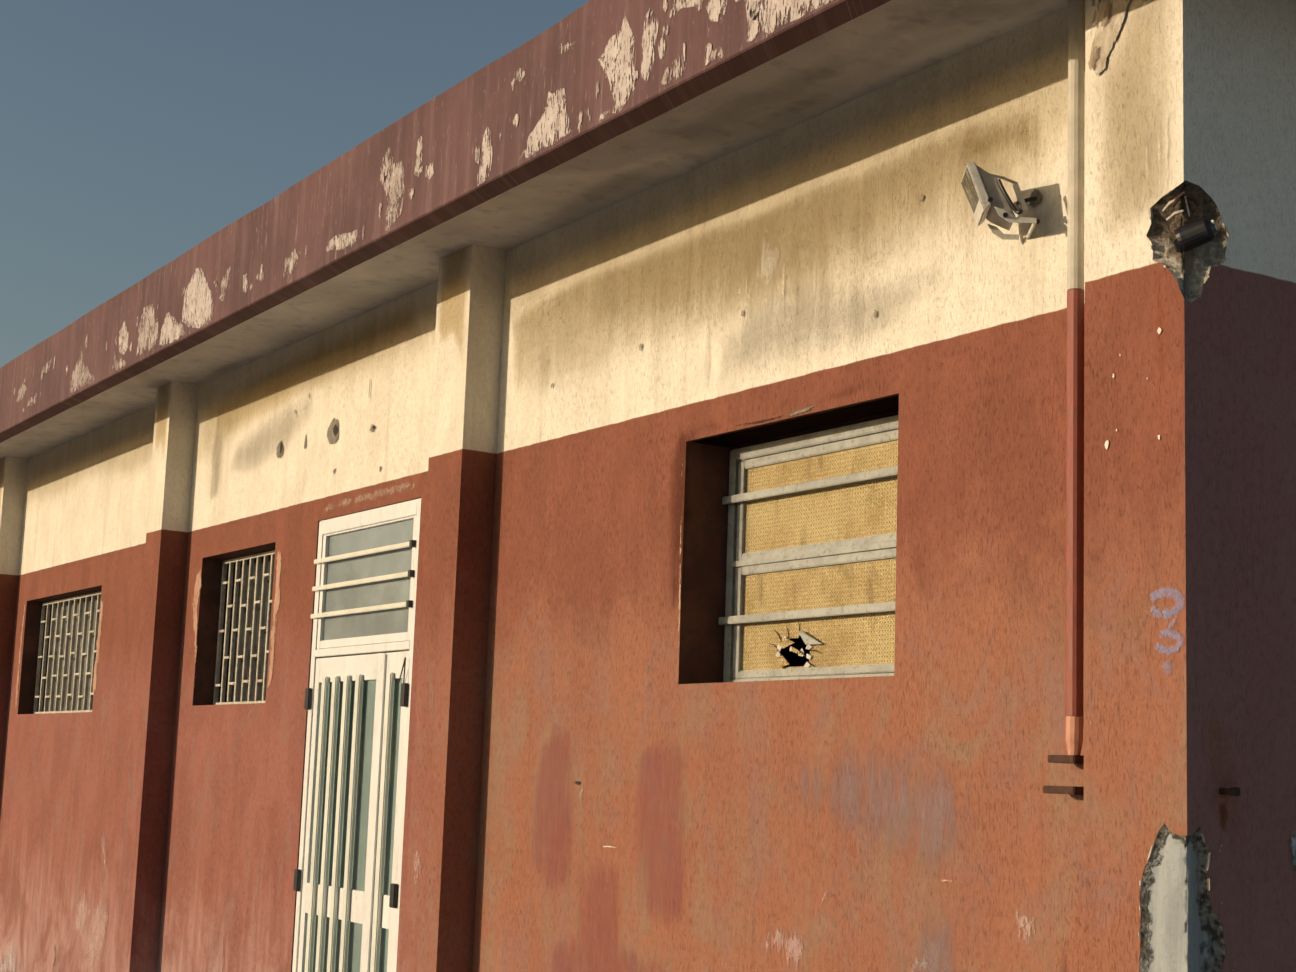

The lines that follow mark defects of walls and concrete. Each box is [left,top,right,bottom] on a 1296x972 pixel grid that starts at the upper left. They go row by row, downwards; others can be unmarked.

peeling [475,0,833,186]
peeling [379,137,434,231]
peeling [281,249,306,278]
peeling [326,225,365,252]
spalling [1147,181,1230,302]
peeling [106,266,264,371]
peeling [14,335,94,410]
spalling [327,417,339,444]
spalling [1138,824,1226,972]